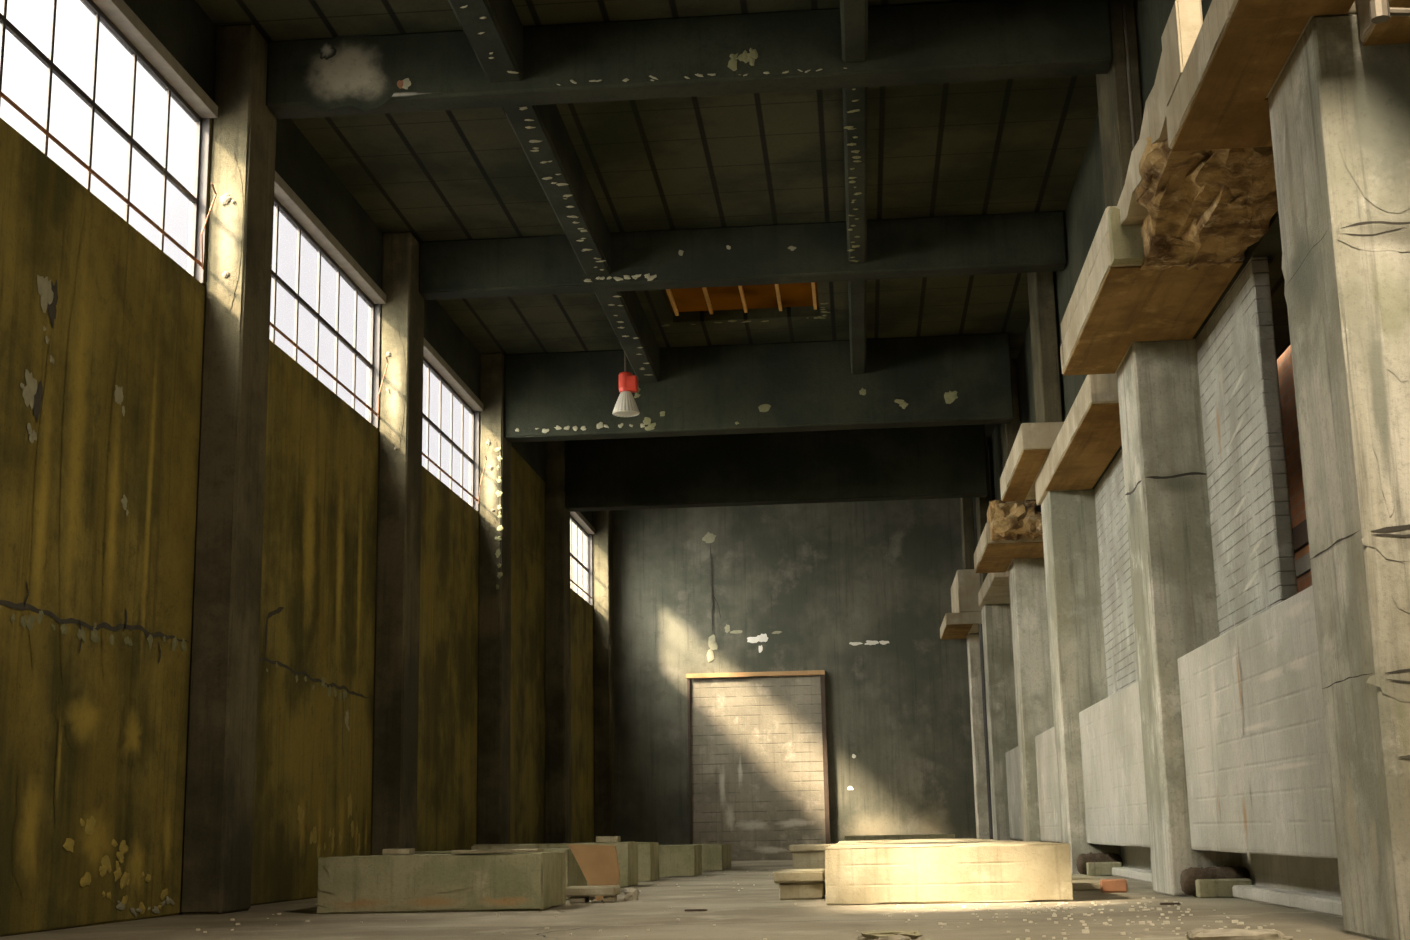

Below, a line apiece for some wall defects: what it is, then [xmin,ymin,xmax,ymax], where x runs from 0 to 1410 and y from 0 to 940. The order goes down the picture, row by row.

water stain [294,34,453,111]
spalling [685,48,822,79]
spalling [37,275,58,364]
spalling [20,369,43,444]
crack [1125,463,1208,528]
crack [1310,518,1410,561]
crack [0,581,189,664]
crack [1322,663,1410,702]